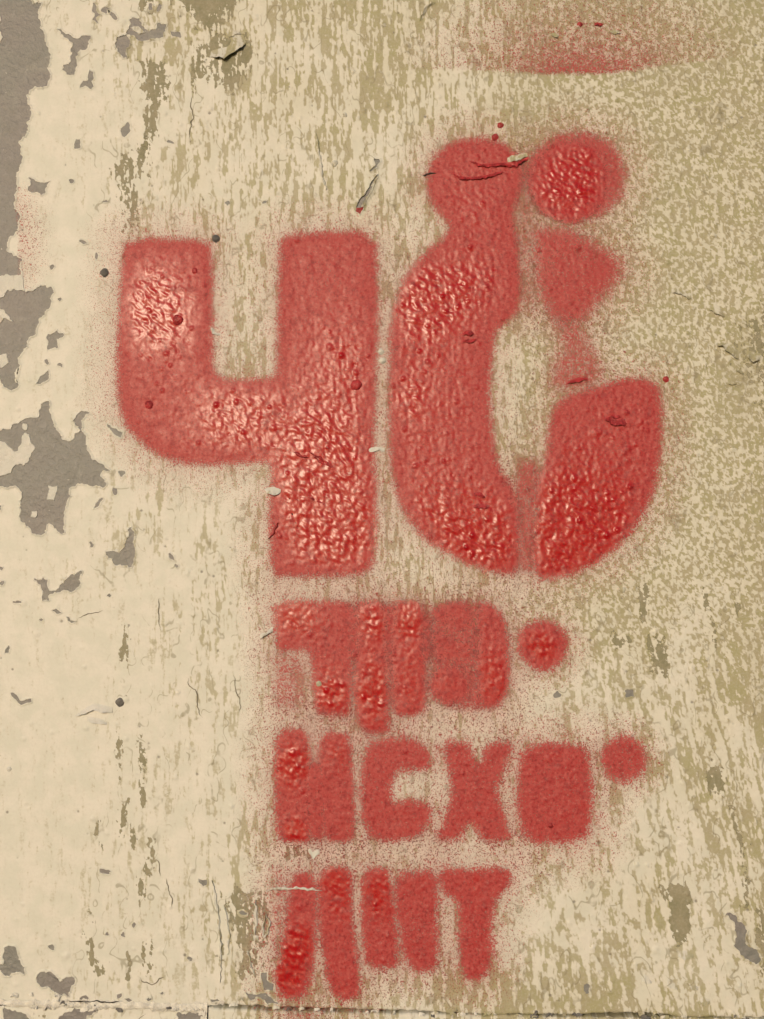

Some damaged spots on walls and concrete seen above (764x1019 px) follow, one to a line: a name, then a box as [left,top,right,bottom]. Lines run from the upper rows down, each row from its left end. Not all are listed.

peeling [0,0,184,539]
peeling [87,525,139,571]
peeling [32,569,85,626]
peeling [723,909,764,968]
peeling [0,941,101,1019]
peeling [115,969,333,1019]